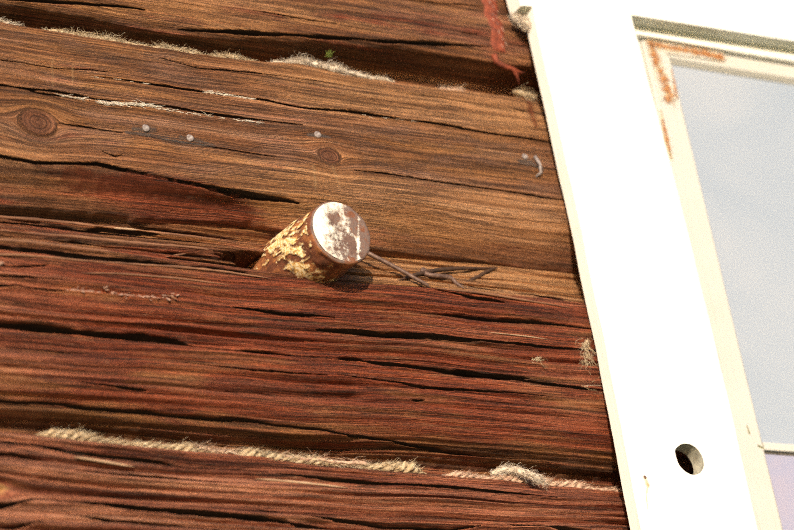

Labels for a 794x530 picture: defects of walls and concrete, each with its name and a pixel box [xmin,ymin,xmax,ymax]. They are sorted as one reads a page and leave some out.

crack [8,0,145,11]
corrosion [649,41,723,102]
crack [0,57,552,143]
crack [59,123,273,157]
crack [0,151,299,204]
crack [355,170,565,201]
crack [0,323,604,402]